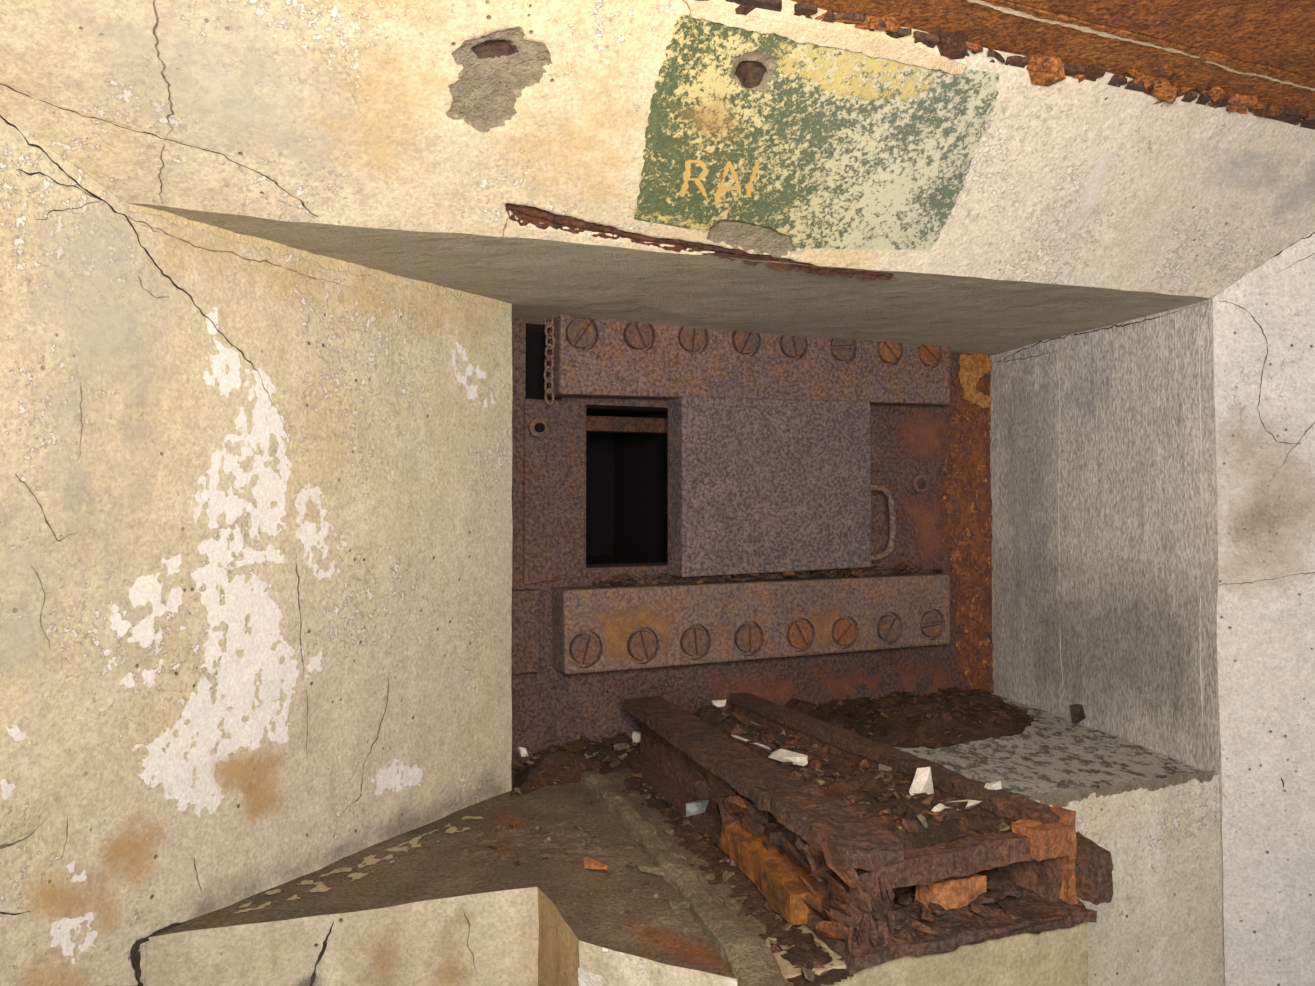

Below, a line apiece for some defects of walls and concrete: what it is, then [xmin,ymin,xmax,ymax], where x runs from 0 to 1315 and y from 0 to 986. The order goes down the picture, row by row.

spalling [446,26,552,132]
spalling [729,51,777,92]
spalling [684,0,967,75]
rust [725,0,1315,130]
crack [0,0,345,436]
crack [1272,232,1315,273]
crack [997,297,1315,486]
peeling [104,307,352,818]
rust [593,353,994,694]
peeling [6,724,30,745]
peeling [371,759,423,796]
crack [310,922,334,986]